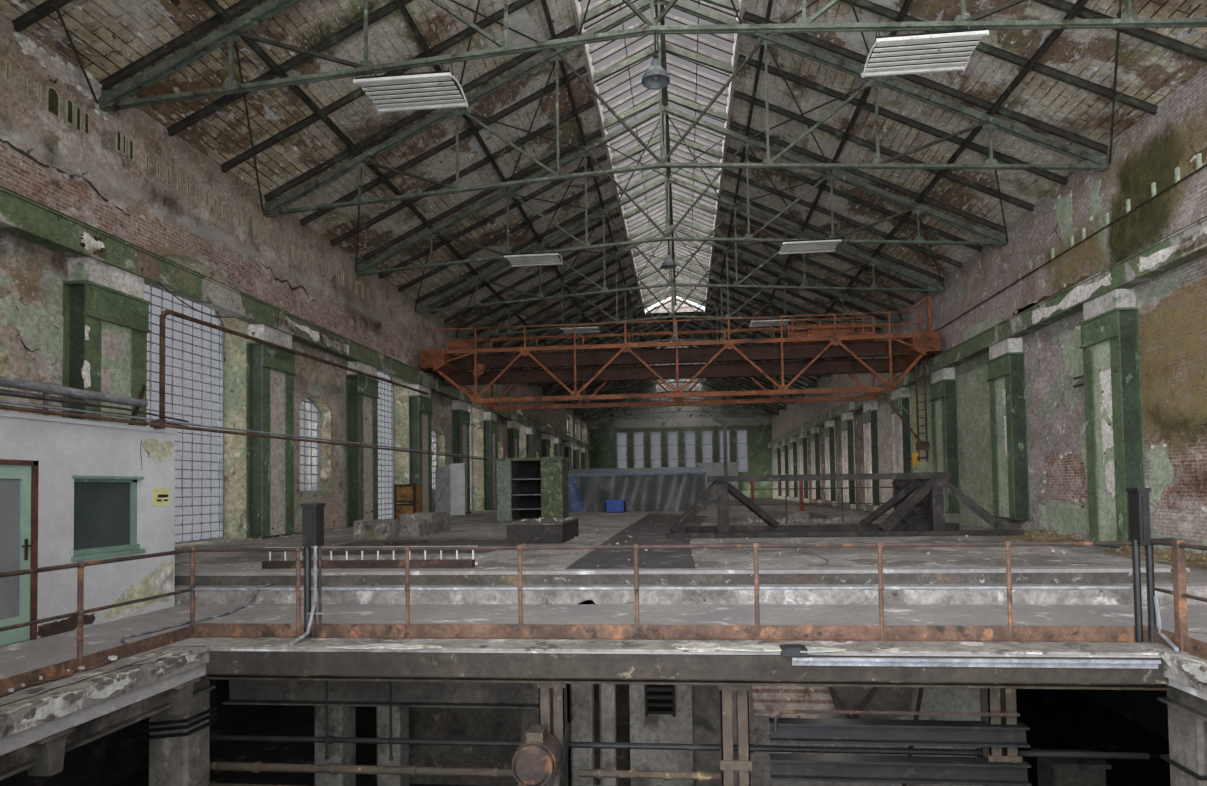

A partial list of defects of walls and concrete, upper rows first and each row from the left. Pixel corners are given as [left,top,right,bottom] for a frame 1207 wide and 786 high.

crack [0,138,130,216]
damp [1119,120,1207,235]
flaking render [0,142,423,371]
damp [1047,219,1103,289]
peeling [1137,225,1207,272]
peeling [1013,273,1112,324]
peeling [81,325,125,394]
spalling [0,650,210,728]
spalling [1167,657,1207,684]